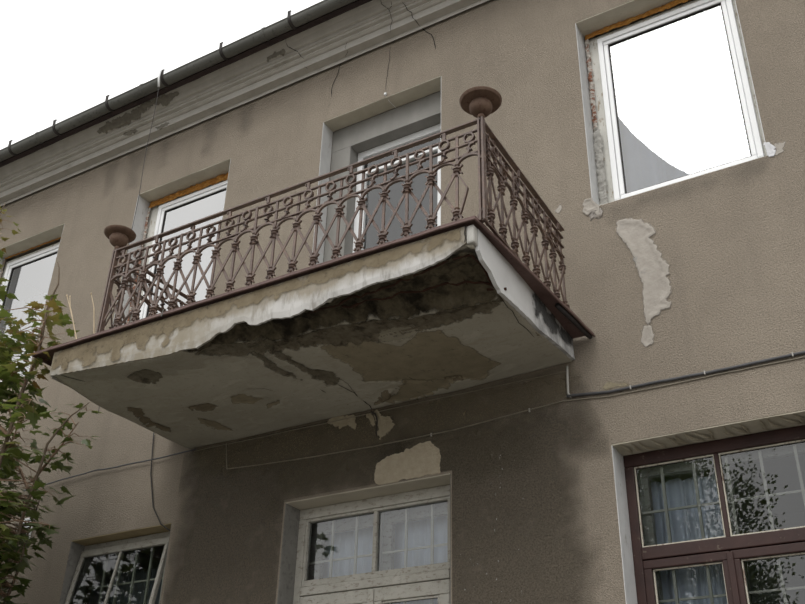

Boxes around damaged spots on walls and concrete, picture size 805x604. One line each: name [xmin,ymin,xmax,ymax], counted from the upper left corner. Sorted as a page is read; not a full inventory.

crack [381,2,436,49]
flaking render [584,39,598,129]
peeling [97,92,179,136]
peeling [763,142,785,157]
spalling [582,198,603,221]
spalling [184,252,507,382]
peeling [641,325,654,347]
spalling [126,407,171,432]
peeling [366,409,395,440]
flaking render [374,441,441,485]